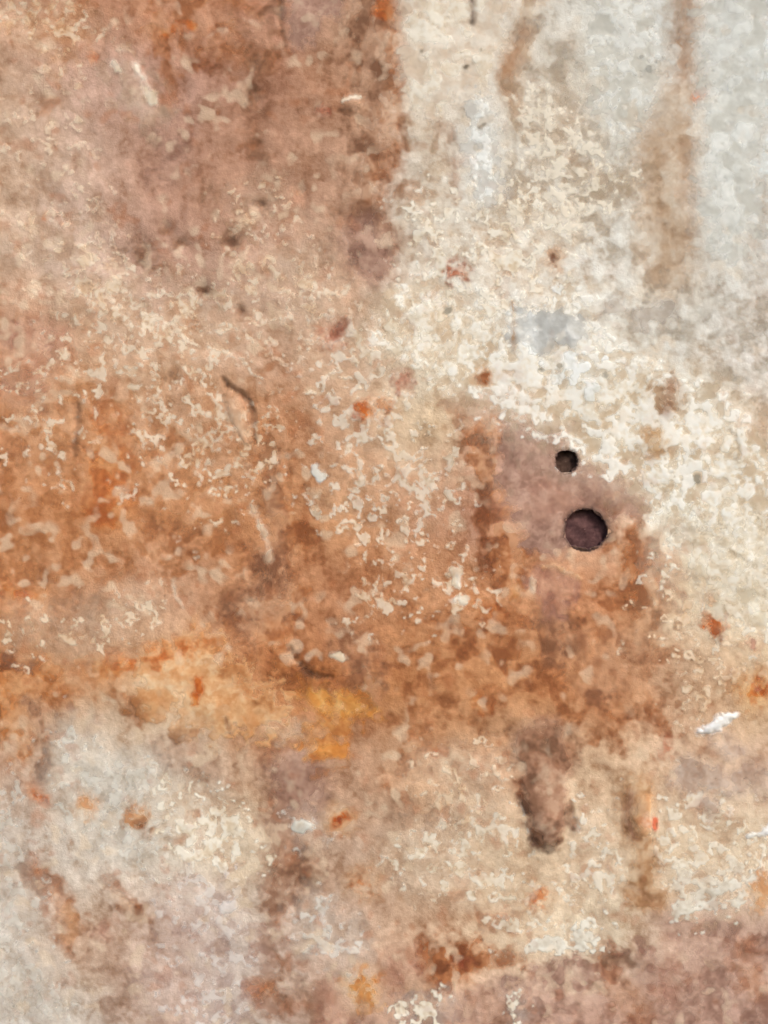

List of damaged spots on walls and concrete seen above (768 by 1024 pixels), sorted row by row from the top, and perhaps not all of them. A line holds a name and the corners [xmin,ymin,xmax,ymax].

damp [500,0,538,113]
damp [639,0,703,291]
corrosion [654,386,676,411]
corrosion [0,509,86,602]
corrosion [0,407,155,539]
corrosion [129,472,231,562]
peeling [312,465,325,481]
corrosion [459,411,671,743]
corrosion [703,619,721,635]
corrosion [0,653,72,779]
corrosion [224,419,382,1024]
corrosion [416,912,768,1024]